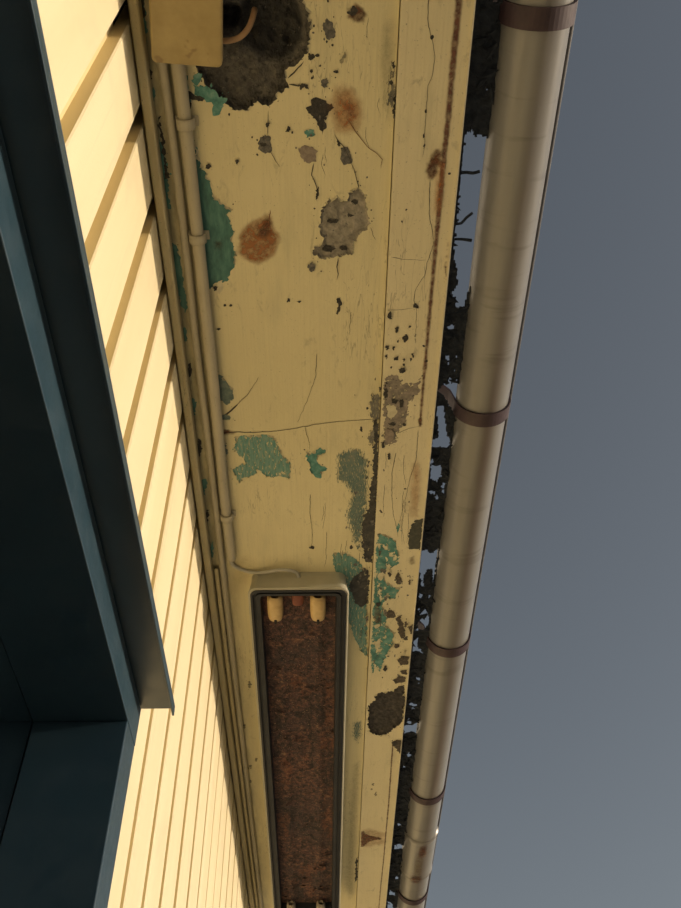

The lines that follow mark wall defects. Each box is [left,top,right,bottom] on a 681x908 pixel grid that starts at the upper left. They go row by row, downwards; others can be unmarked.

corrosion [240,211,276,261]
spalling [187,0,376,294]
corrosion [336,93,383,164]
corrosion [418,0,462,426]
peeling [225,431,291,483]
crack [222,355,371,450]
peeling [300,311,425,753]
corrosion [361,745,393,904]